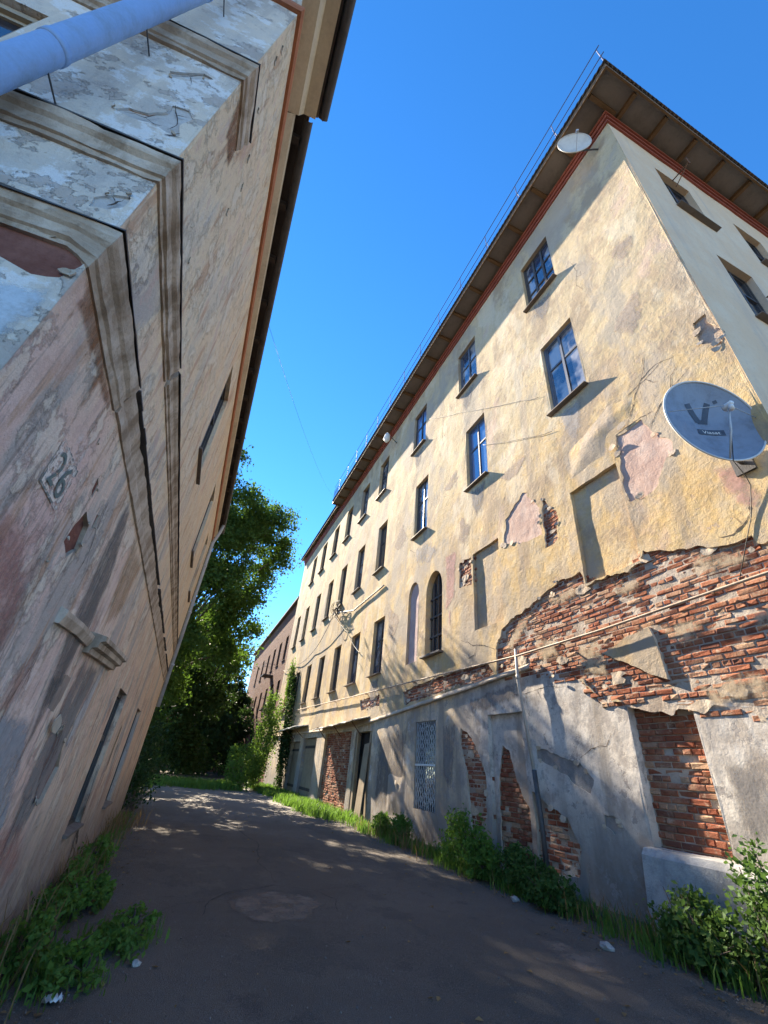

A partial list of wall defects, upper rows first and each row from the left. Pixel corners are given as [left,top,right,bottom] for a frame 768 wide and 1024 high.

peeling [111,105,193,136]
crack [127,106,187,138]
spalling [692,315,726,352]
peeling [614,420,676,502]
peeling [500,493,559,549]
flaking render [404,537,768,723]
flaking render [461,730,497,833]
flaking render [534,793,582,879]